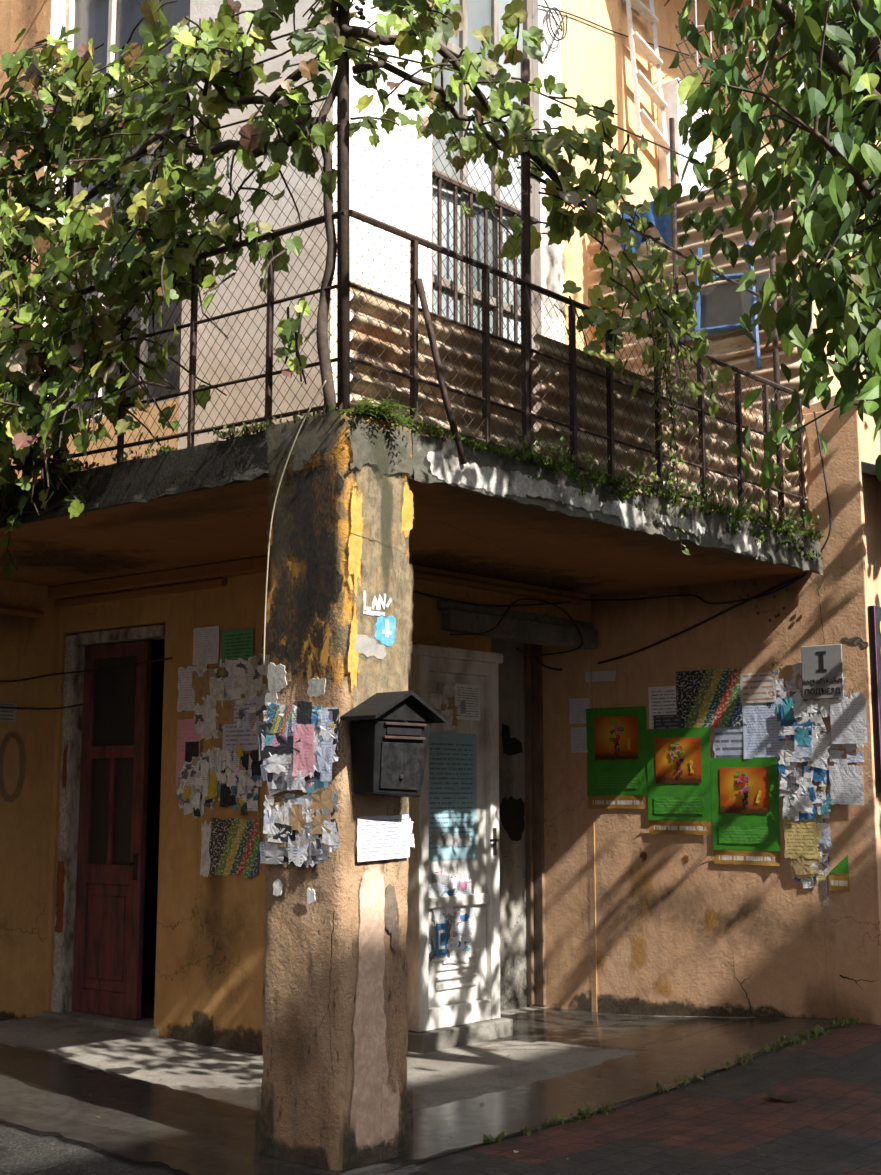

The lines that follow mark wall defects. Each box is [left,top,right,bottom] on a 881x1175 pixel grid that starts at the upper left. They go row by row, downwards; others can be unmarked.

peeling [427,451,708,537]
spalling [264,410,414,691]
peeling [721,529,768,559]
peeling [176,613,340,867]
peeling [429,693,466,732]
peeling [398,818,415,848]
crack [730,947,753,1013]
damp [0,961,852,1175]